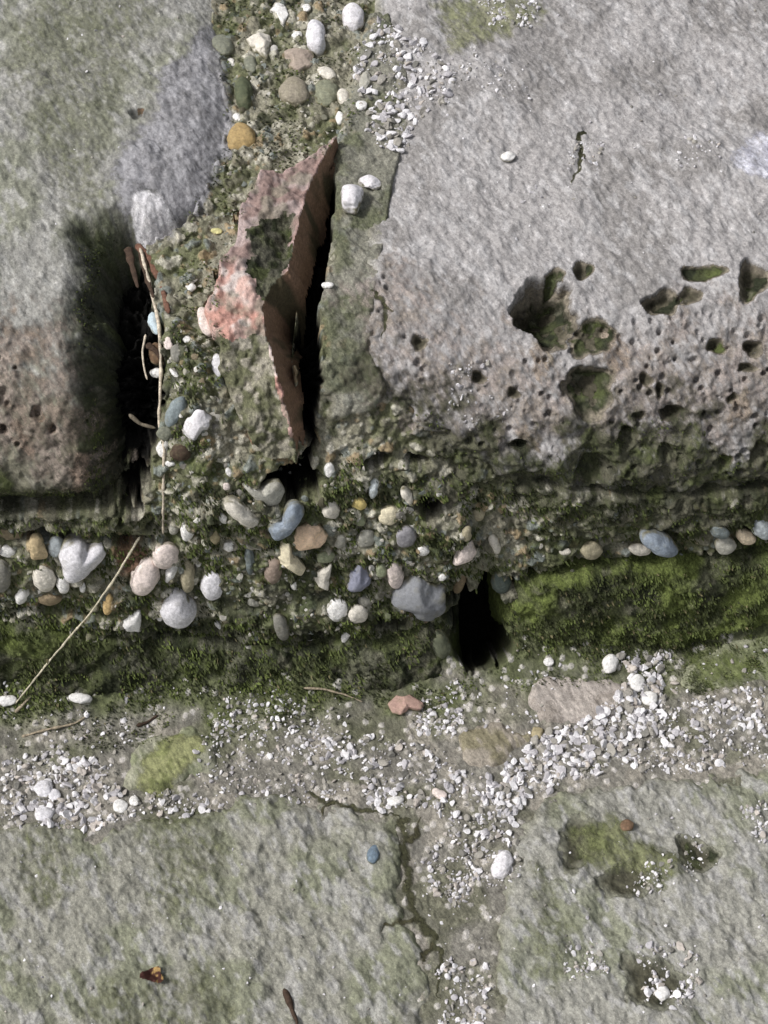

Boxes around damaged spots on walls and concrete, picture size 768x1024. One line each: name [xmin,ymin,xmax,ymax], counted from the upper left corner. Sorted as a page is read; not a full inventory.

hole [641,260,768,316]
hole [508,261,617,422]
hole [706,338,727,354]
hole [738,341,763,372]
hole [619,372,683,436]
spalling [181,409,212,441]
hole [719,453,734,468]
spalling [438,574,467,594]
crack [308,791,444,999]